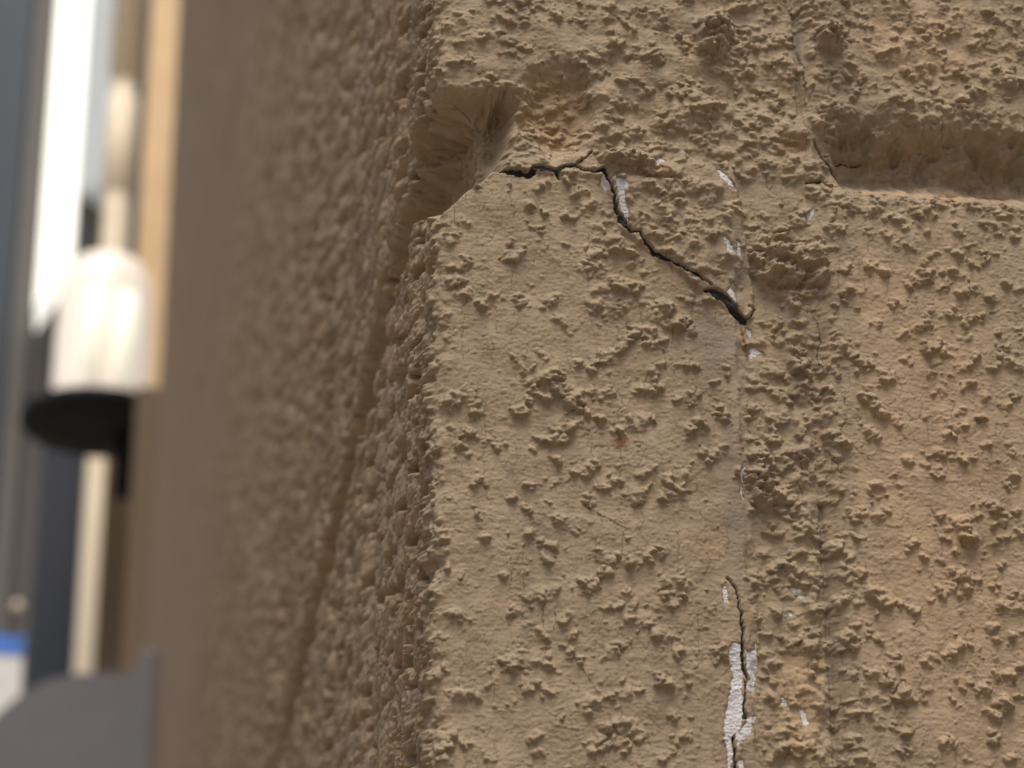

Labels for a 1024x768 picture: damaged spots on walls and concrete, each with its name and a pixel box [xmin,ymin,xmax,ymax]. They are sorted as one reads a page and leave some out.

peeling [600,174,629,221]
crack [499,153,747,325]
crack [715,156,784,203]
crack [726,579,748,768]
peeling [723,643,758,768]